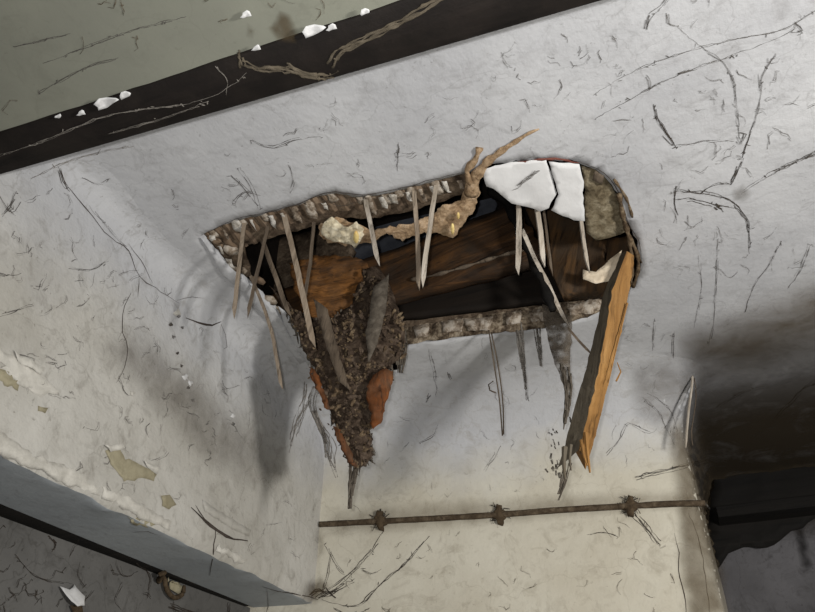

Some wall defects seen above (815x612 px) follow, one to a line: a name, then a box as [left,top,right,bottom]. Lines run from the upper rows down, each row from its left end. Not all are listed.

peeling [0,347,59,413]
crack [59,169,227,383]
spalling [201,173,471,366]
spalling [403,299,602,344]
peeling [484,158,642,288]
peeling [105,444,160,481]
peeling [161,495,176,509]
damp [676,433,720,612]